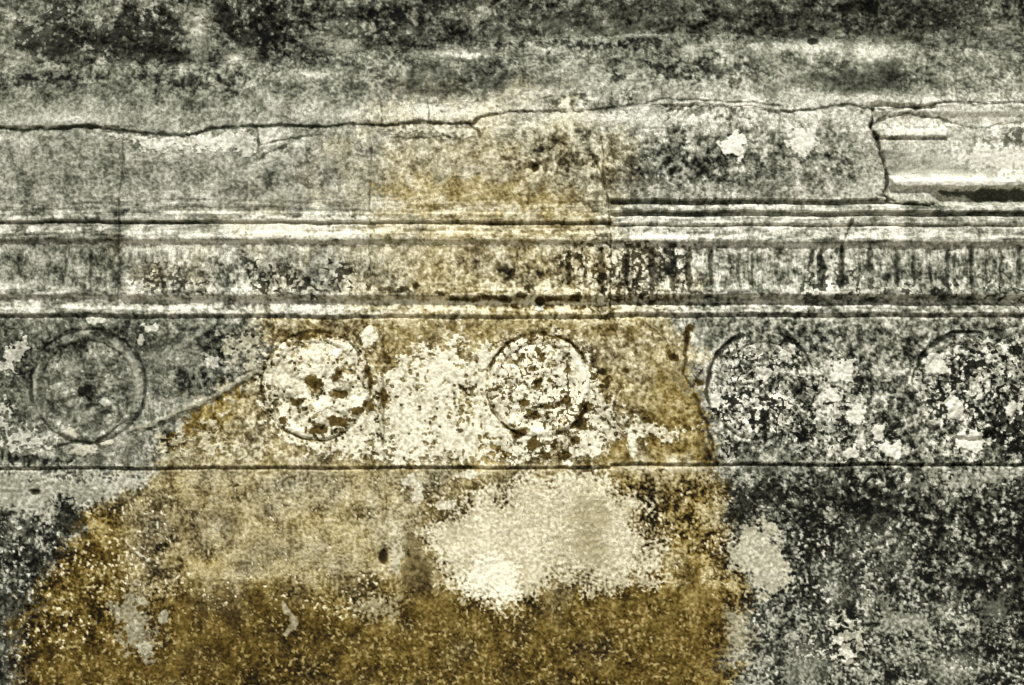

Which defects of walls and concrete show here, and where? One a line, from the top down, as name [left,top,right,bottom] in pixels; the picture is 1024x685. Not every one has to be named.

crack [0,93,1024,361]
leakage [0,245,1024,685]